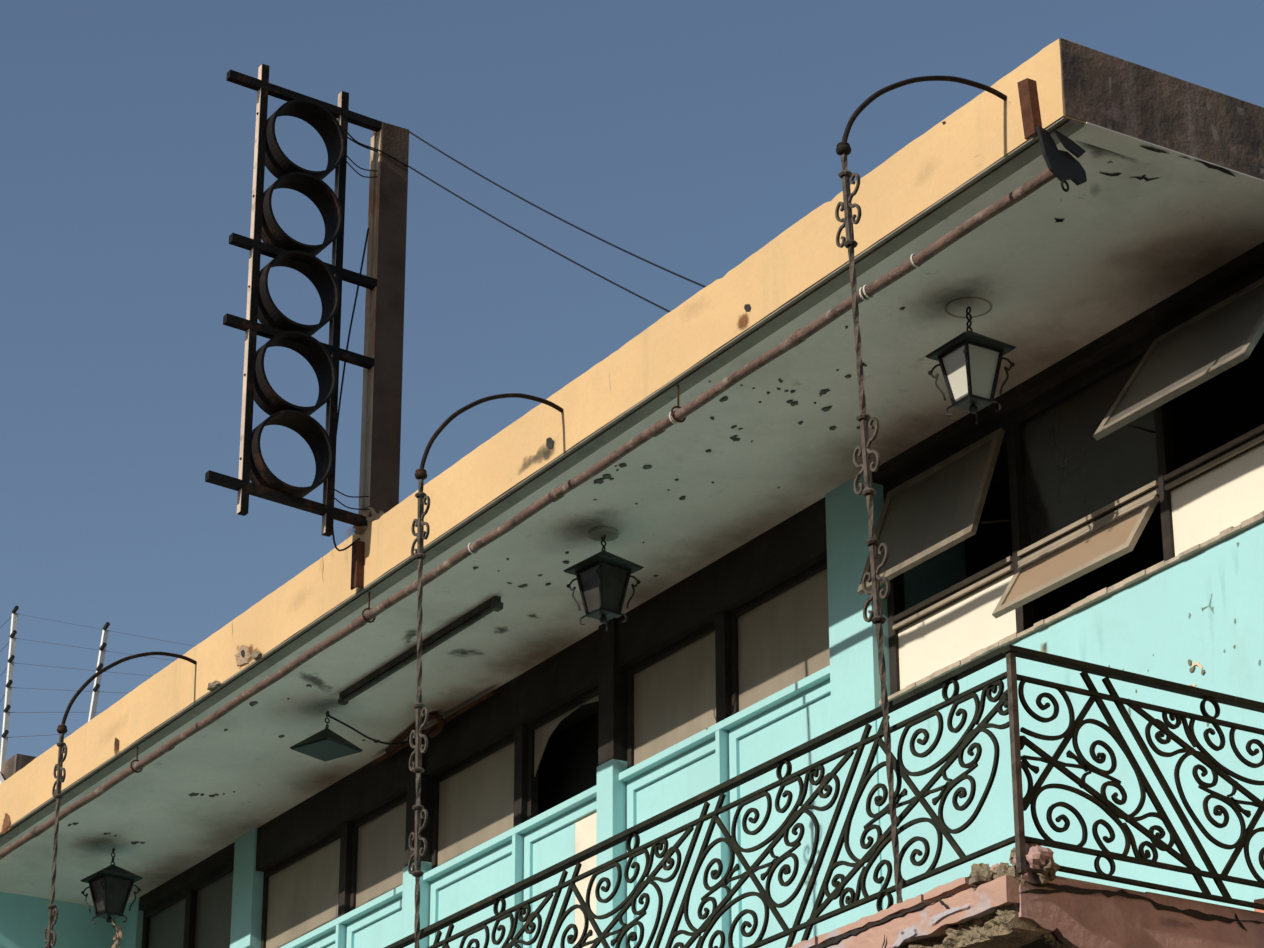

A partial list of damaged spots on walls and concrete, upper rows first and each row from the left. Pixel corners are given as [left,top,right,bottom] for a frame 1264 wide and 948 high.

spalling [969,842,1060,891]
spalling [891,903,1069,948]